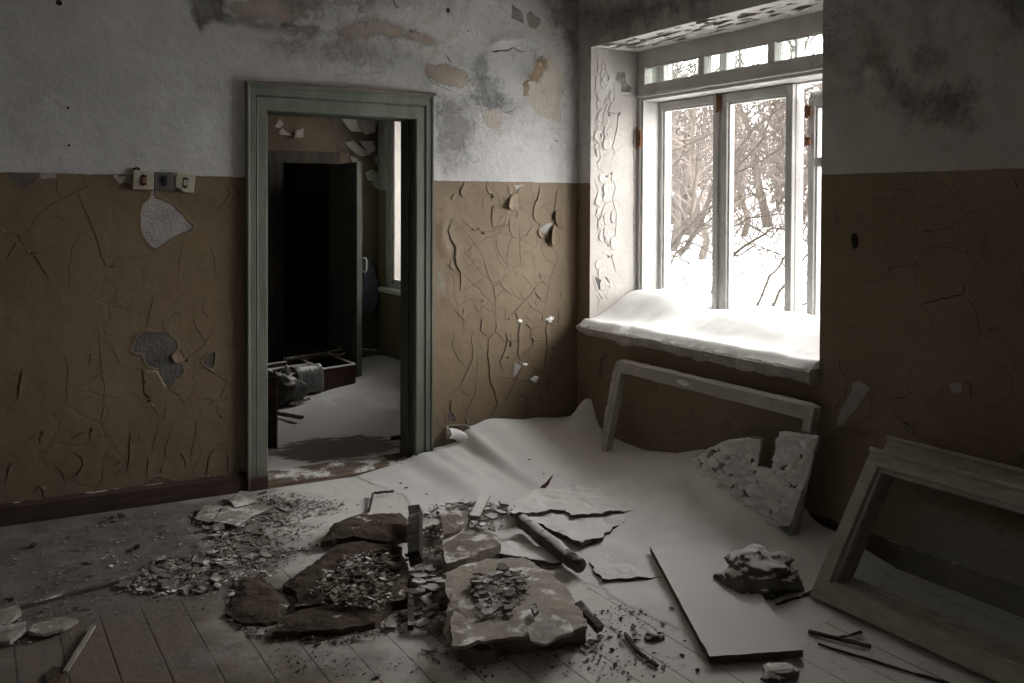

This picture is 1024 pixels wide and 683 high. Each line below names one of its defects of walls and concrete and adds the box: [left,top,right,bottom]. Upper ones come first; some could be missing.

peeling [595,0,823,52]
spalling [520,57,569,125]
peeling [594,62,634,157]
peeling [136,190,198,253]
peeling [491,181,527,228]
peeling [533,207,564,247]
crack [230,237,245,295]
crack [447,116,567,426]
peeling [592,260,612,298]
peeling [127,327,219,399]
crack [0,403,107,501]
crack [115,401,198,478]